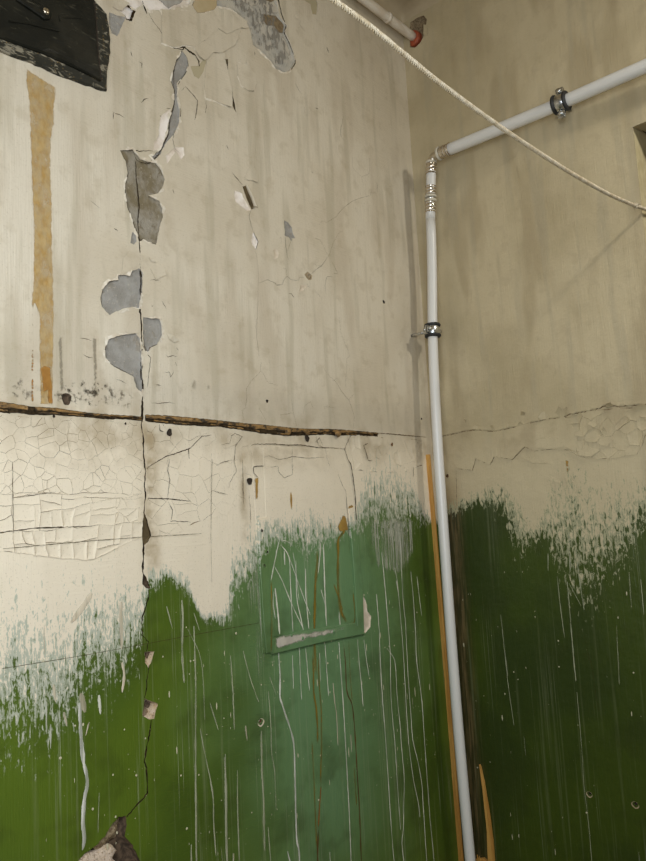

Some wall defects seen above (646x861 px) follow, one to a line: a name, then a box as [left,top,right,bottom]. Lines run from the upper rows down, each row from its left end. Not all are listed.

flaking render [109,0,296,246]
flaking render [100,269,164,397]
crack [0,48,424,698]
peeling [442,400,646,470]
flaking render [144,651,154,667]
flaking render [142,698,158,719]
crack [127,720,152,817]
spalling [79,816,140,861]